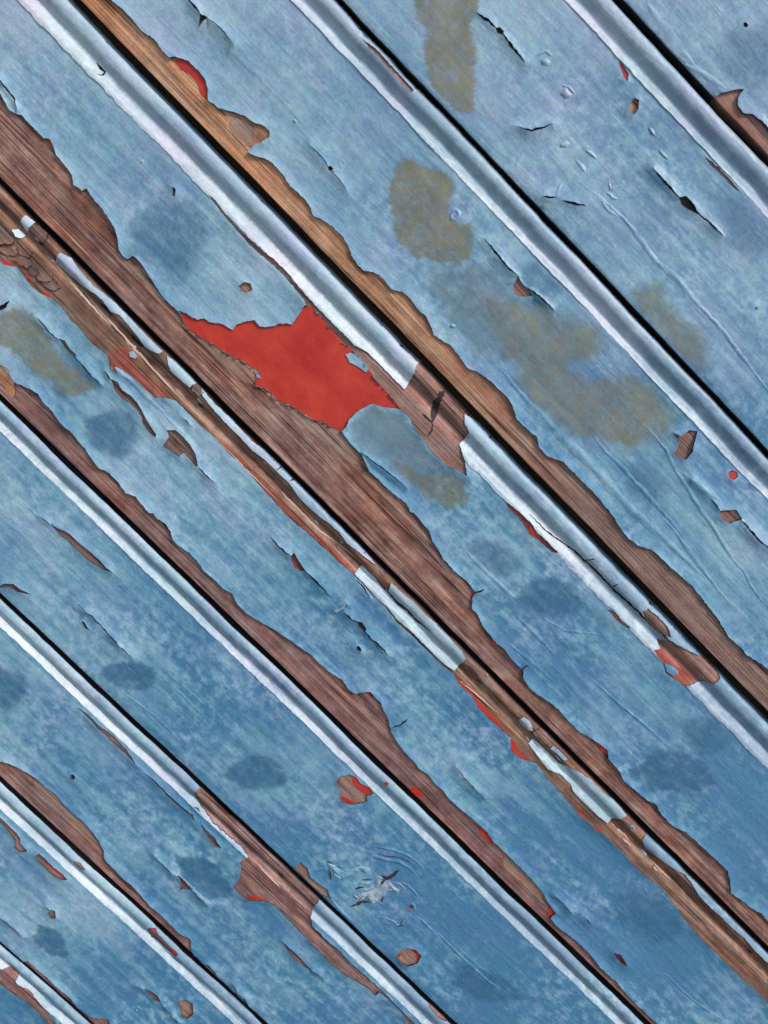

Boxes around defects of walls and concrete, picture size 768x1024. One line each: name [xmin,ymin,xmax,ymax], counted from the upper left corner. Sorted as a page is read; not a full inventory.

leakage [417,0,477,111]
leakage [391,161,470,261]
peeling [81,0,768,711]
peeling [0,185,768,1003]
peeling [0,961,110,1024]